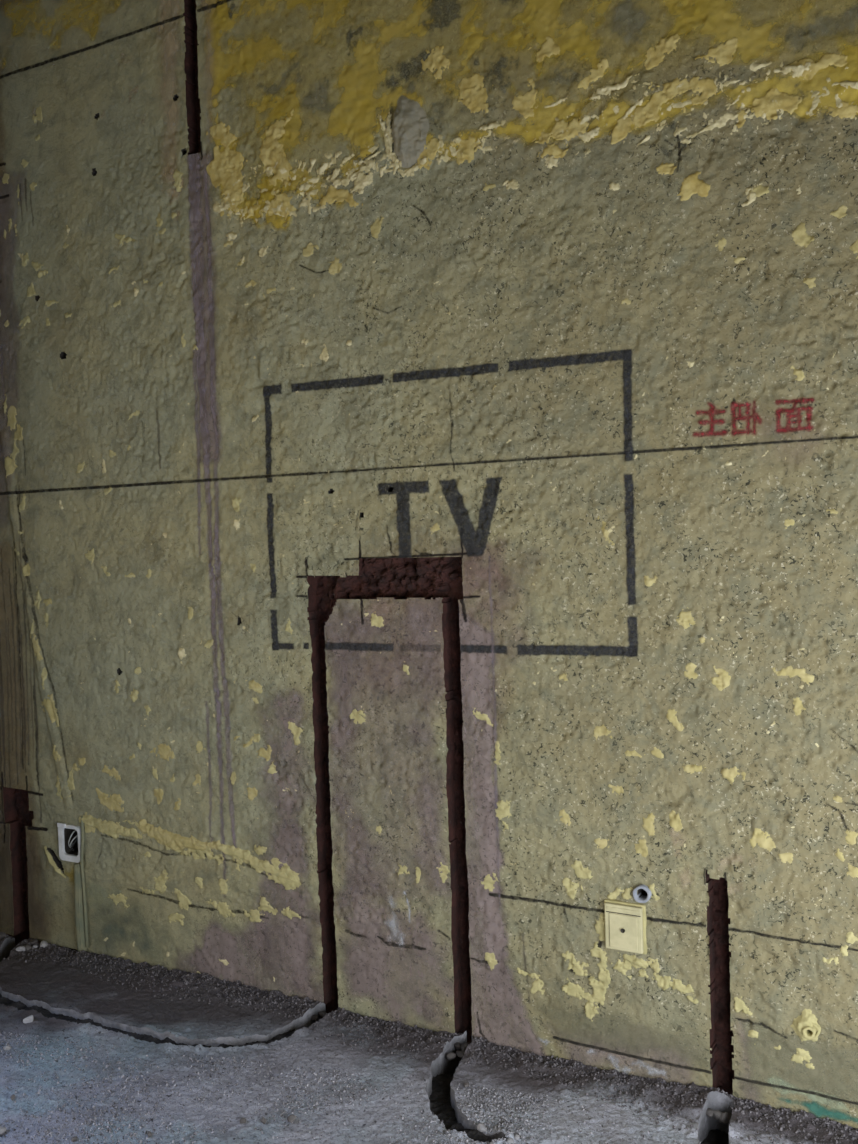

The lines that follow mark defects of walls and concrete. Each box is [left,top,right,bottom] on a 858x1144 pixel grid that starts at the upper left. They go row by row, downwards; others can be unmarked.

peeling [205,0,858,248]